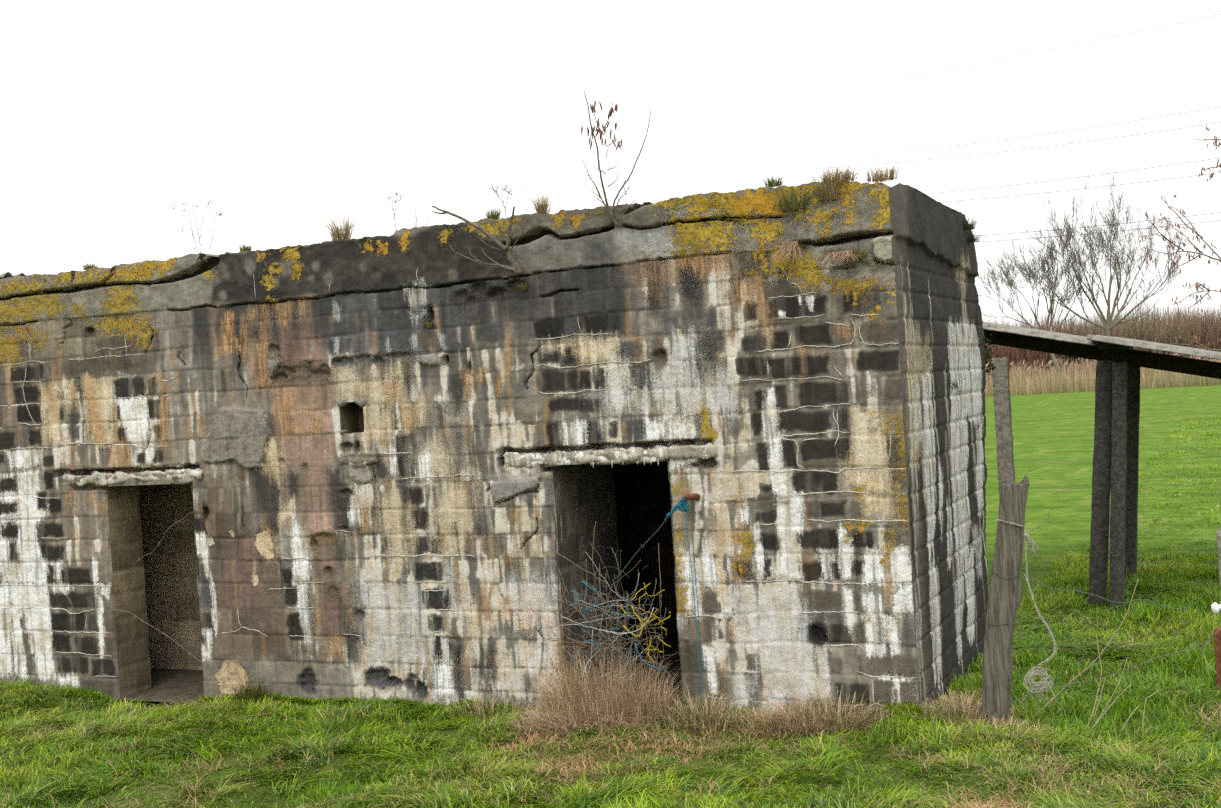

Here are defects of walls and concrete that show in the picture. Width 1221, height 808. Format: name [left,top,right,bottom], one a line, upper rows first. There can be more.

crack [510,216,783,246]
crack [798,233,895,269]
damp [0,372,154,688]
crack [0,253,728,451]
damp [733,387,829,713]
crack [733,269,906,529]
damp [819,523,914,659]
damp [838,405,898,517]
damp [922,319,984,689]
peeling [215,659,248,694]
spalling [296,668,316,694]
spalling [364,667,428,699]